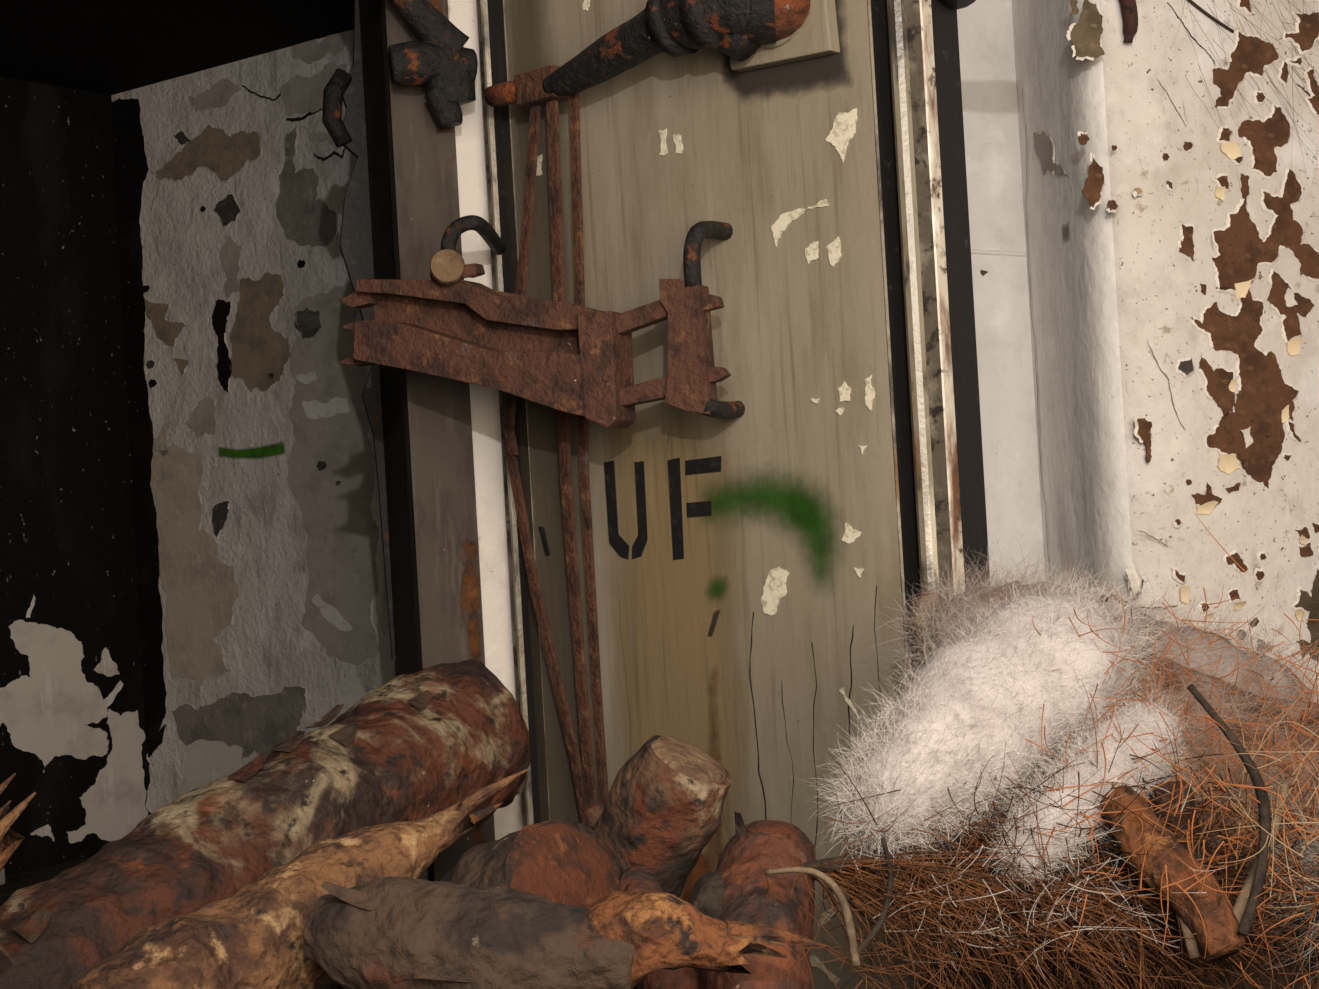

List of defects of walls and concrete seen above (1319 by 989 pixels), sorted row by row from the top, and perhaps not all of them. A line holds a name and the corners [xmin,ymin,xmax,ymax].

peeling [1066,0,1105,61]
peeling [1236,0,1253,16]
peeling [275,31,348,268]
peeling [1034,131,1069,178]
peeling [1078,131,1119,213]
peeling [1175,10,1319,514]
peeling [0,78,381,845]
peeling [1134,415,1153,463]
peeling [761,567,789,615]
peeling [1291,523,1319,662]